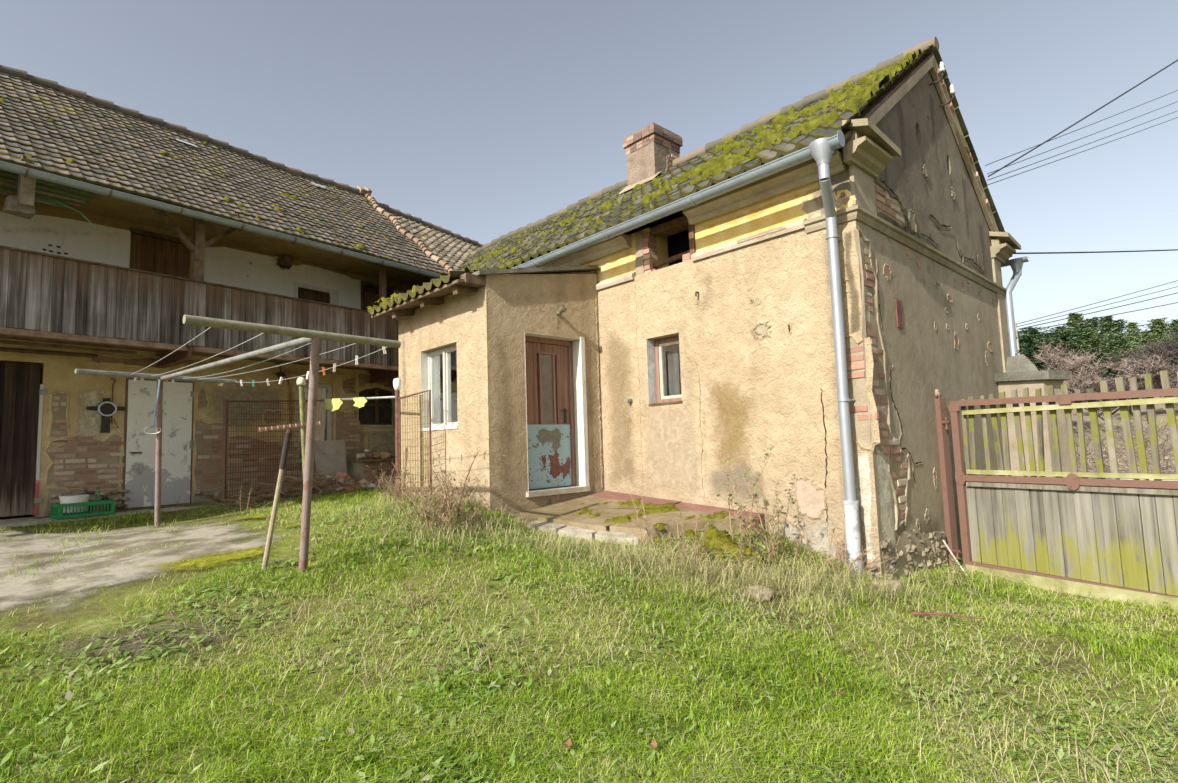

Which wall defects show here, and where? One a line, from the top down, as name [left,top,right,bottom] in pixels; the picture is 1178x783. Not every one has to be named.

peeling [801,197,820,219]
flaking render [833,190,855,211]
flaking render [840,179,947,568]
flaking render [43,390,143,492]
peeling [527,427,571,506]
leakage [714,389,760,496]
peeling [770,475,827,548]
crack [816,387,831,553]